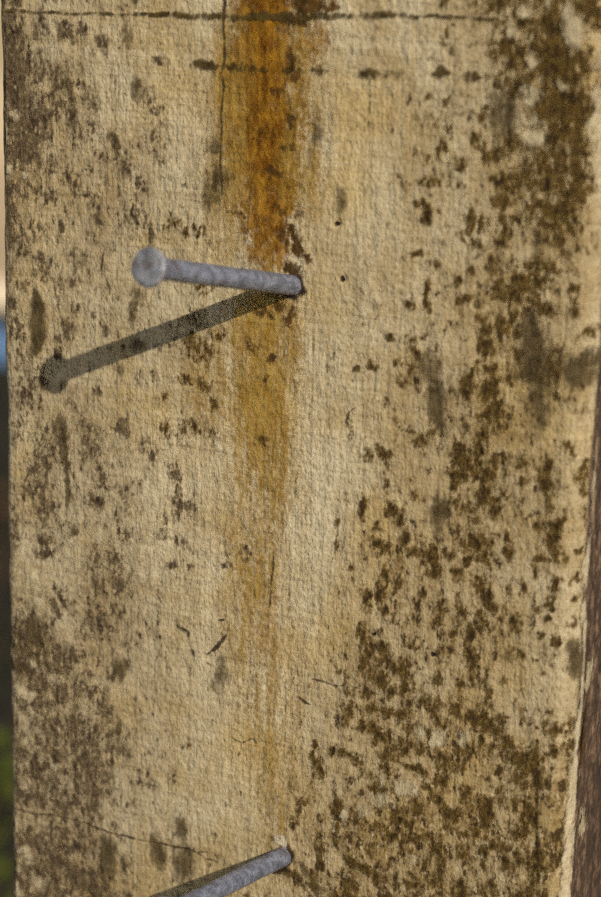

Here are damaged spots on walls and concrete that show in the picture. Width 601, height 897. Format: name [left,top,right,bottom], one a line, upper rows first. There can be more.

water stain [203,166,233,207]
crack [5,0,497,195]
rust [211,0,339,277]
rust [231,292,302,479]
water stain [281,0,601,897]
crack [18,809,219,863]